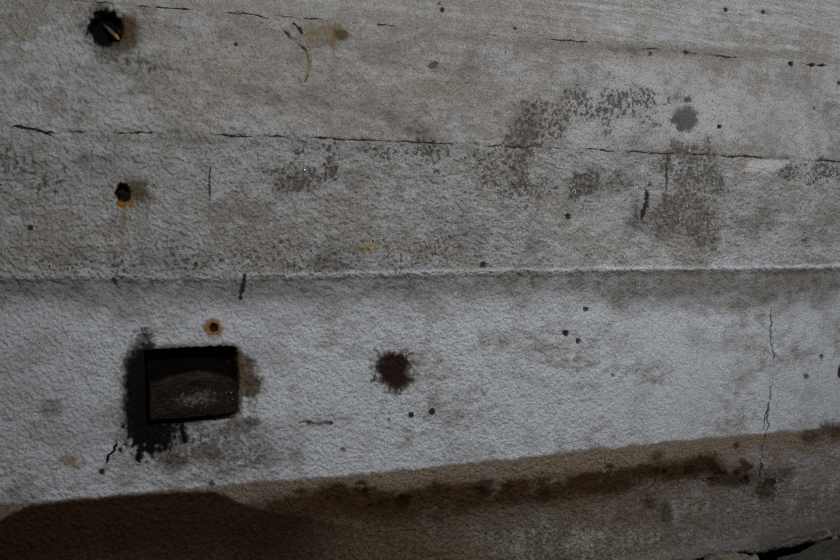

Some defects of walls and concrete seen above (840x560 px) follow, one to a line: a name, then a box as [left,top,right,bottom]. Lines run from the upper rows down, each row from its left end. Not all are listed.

water stain [671,97,698,131]
corrosion [204,320,222,335]
water stain [154,345,266,473]
water stain [0,423,840,560]